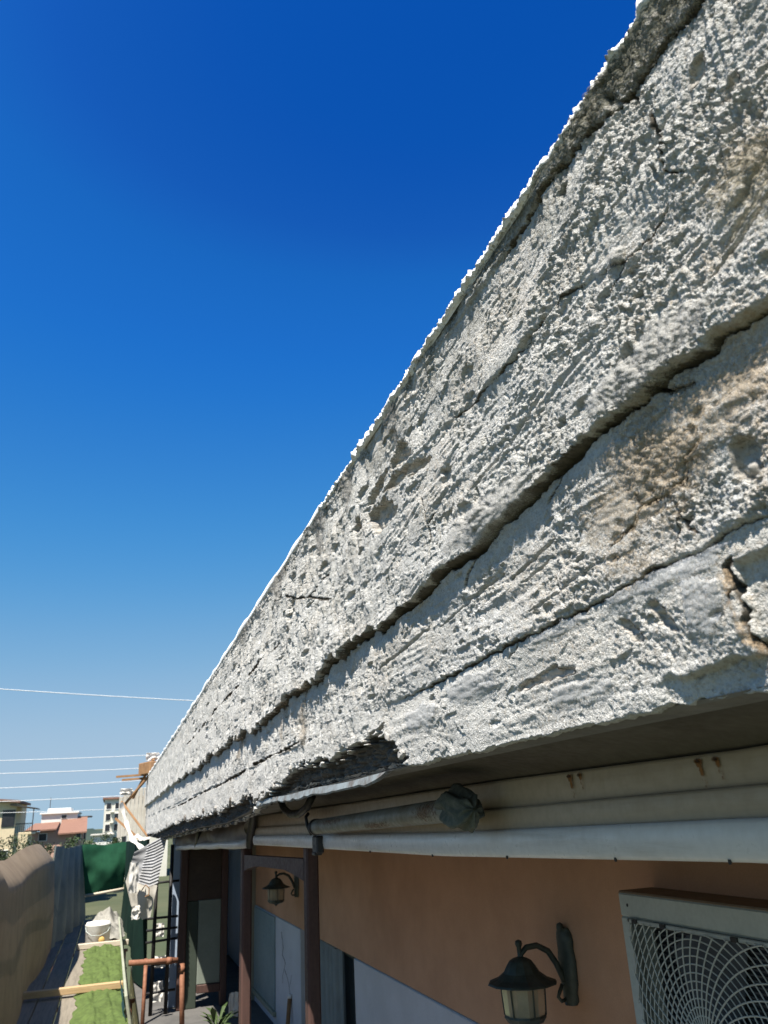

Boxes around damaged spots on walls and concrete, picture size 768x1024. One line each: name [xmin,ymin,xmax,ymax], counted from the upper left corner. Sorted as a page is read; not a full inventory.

spalling [148,730,409,840]
crack [171,314,768,809]